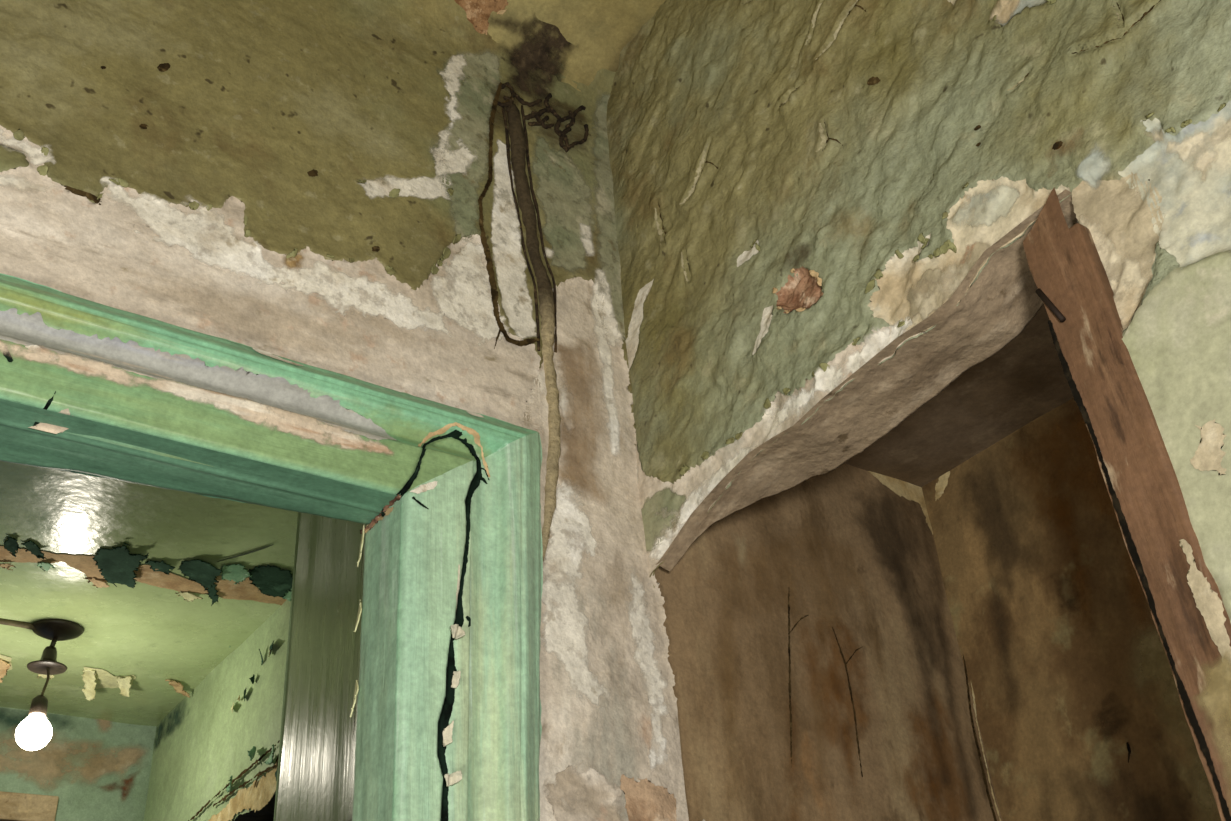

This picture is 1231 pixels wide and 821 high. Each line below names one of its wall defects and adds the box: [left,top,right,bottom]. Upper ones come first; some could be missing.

peeling [990,0,1057,27]
leakage [495,20,583,141]
peeling [0,51,549,530]
peeling [533,94,1231,821]
peeling [0,536,293,606]
leakage [869,498,908,584]
leakage [971,480,1020,568]
crack [354,422,490,821]
peeling [81,667,136,701]
peeling [231,641,274,713]
peeling [188,740,280,821]
crack [349,663,359,818]